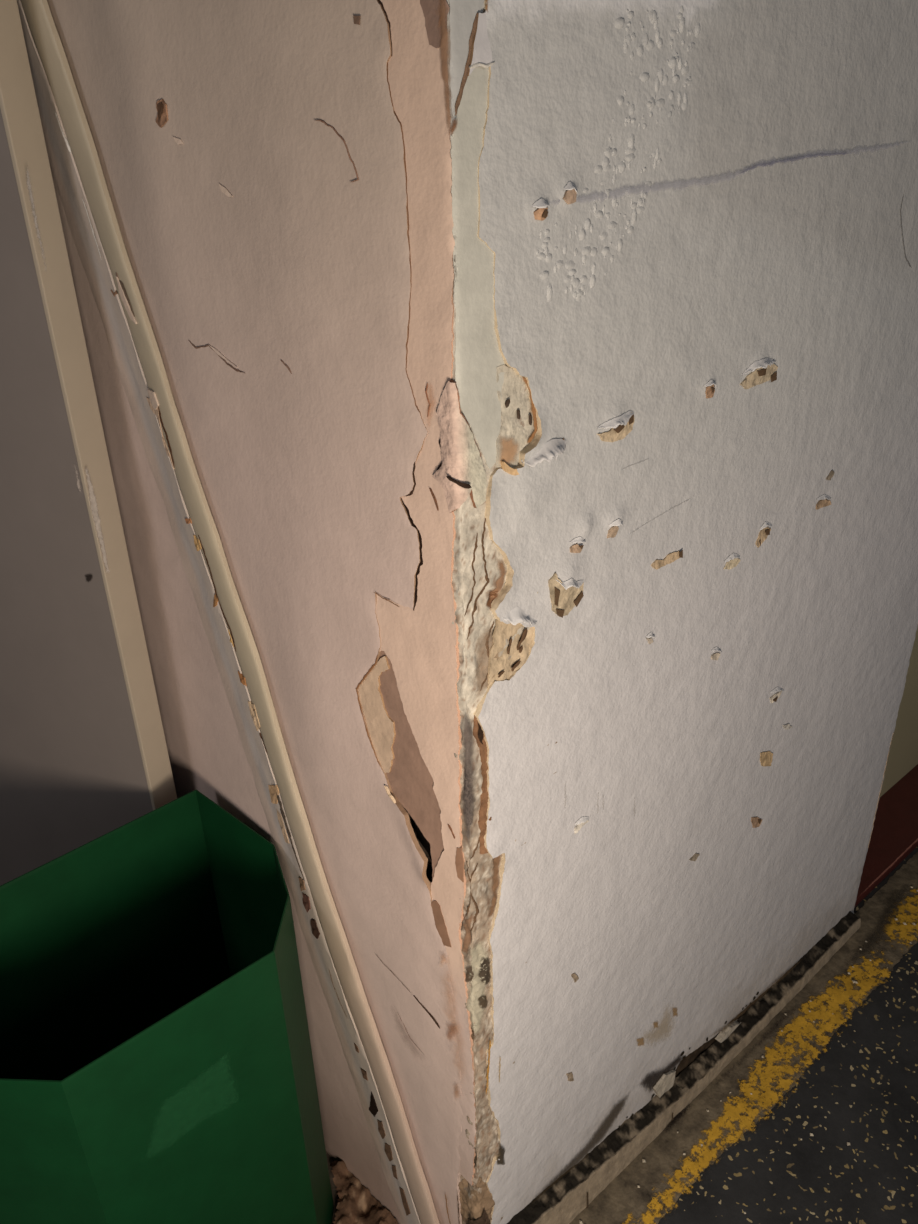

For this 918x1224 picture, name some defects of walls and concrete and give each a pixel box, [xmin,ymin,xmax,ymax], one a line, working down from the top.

peeling [156,99,168,128]
crack [316,120,359,182]
peeling [563,181,578,204]
crack [374,0,442,611]
crack [188,340,244,373]
peeling [740,358,778,389]
peeling [597,411,635,442]
peeling [569,537,586,553]
peeling [651,550,683,570]
peeling [537,572,584,618]
flaking render [356,0,567,1224]
crack [376,955,440,1051]